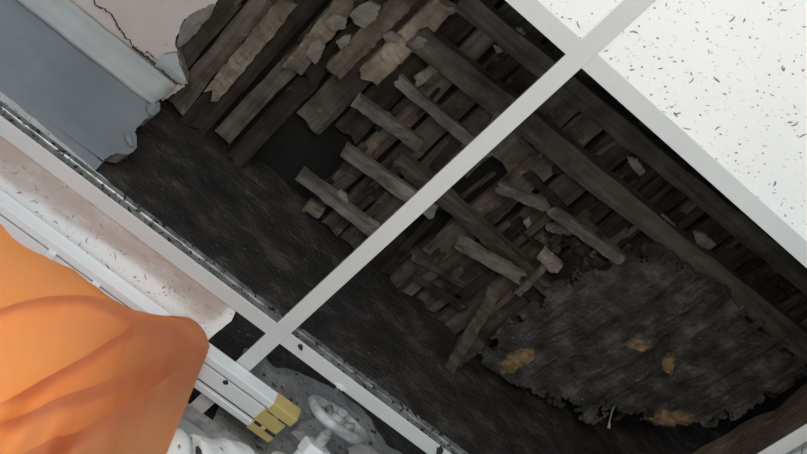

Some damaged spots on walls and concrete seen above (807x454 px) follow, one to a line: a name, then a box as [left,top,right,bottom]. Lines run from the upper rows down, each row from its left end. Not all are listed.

crack [93,0,181,85]
peeling [306,38,326,65]
peeling [323,0,381,50]
peeling [0,0,218,171]
peeling [627,155,645,176]
peeling [693,231,716,249]
flaking render [213,357,403,454]